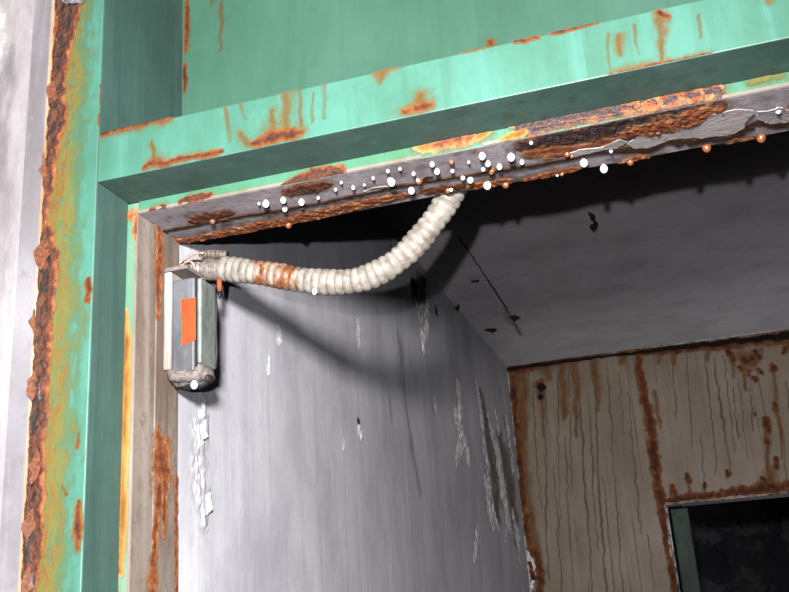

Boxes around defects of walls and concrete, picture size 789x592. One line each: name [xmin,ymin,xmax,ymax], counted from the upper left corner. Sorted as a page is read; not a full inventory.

corrosion [174,163,580,244]
corrosion [413,131,492,154]
corrosion [500,85,731,160]
peeling [570,107,789,157]
corrosion [21,0,93,592]
crack [457,236,520,334]
corrosion [118,307,132,578]
corrosion [145,425,178,592]
peeling [192,393,213,530]
peeling [453,378,471,470]
peeling [475,373,537,592]
corrosion [507,330,789,592]